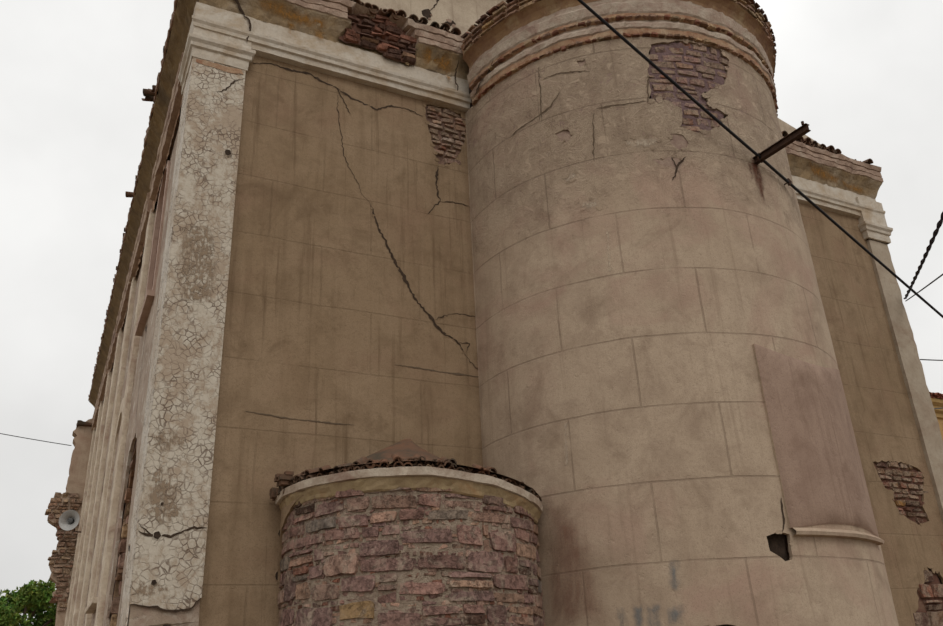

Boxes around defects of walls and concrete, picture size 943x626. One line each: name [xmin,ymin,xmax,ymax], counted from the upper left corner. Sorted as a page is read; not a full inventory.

flaking render [344,13,417,65]
spalling [423,104,466,167]
crack [454,61,493,97]
crack [513,68,586,134]
crack [592,76,649,156]
spalling [623,38,729,170]
crack [220,0,479,377]
spalling [873,460,928,526]
crack [139,525,206,538]